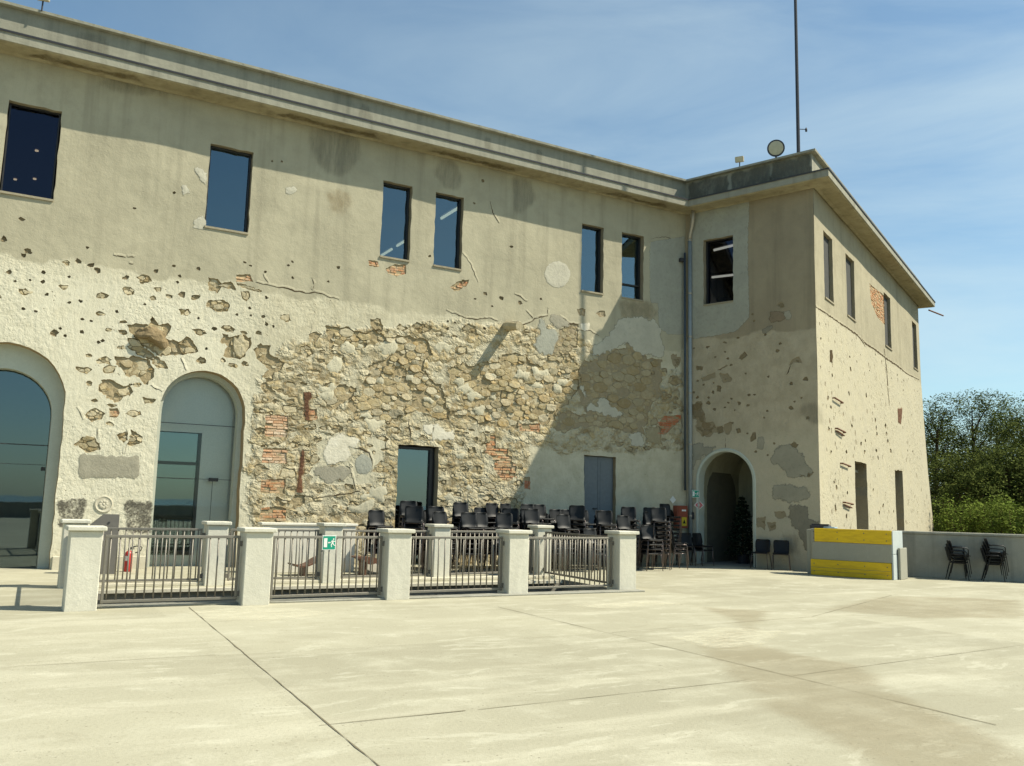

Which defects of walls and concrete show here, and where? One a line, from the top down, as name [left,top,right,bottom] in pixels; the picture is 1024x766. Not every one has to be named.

spalling [6,246,101,313]
crack [256,273,339,299]
crack [463,252,479,282]
flaking render [869,283,885,324]
crack [816,305,919,405]
spalling [73,260,775,530]